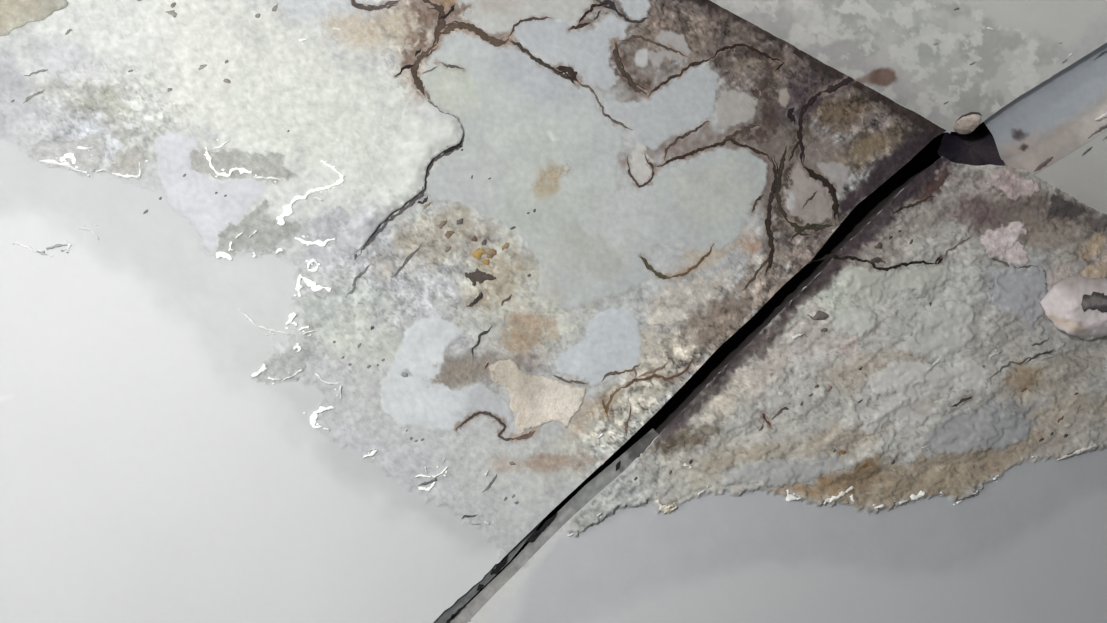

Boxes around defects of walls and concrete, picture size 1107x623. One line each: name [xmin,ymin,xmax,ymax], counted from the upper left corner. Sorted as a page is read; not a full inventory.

rust [321,1,428,55]
rust [433,0,460,12]
flaking render [0,0,833,560]
flaking render [564,0,1107,539]
crack [462,285,512,371]
crack [451,408,542,444]
crack [547,356,699,436]
crack [756,406,783,432]
crack [946,337,1059,413]
crack [461,473,497,525]
damp [498,449,1107,623]